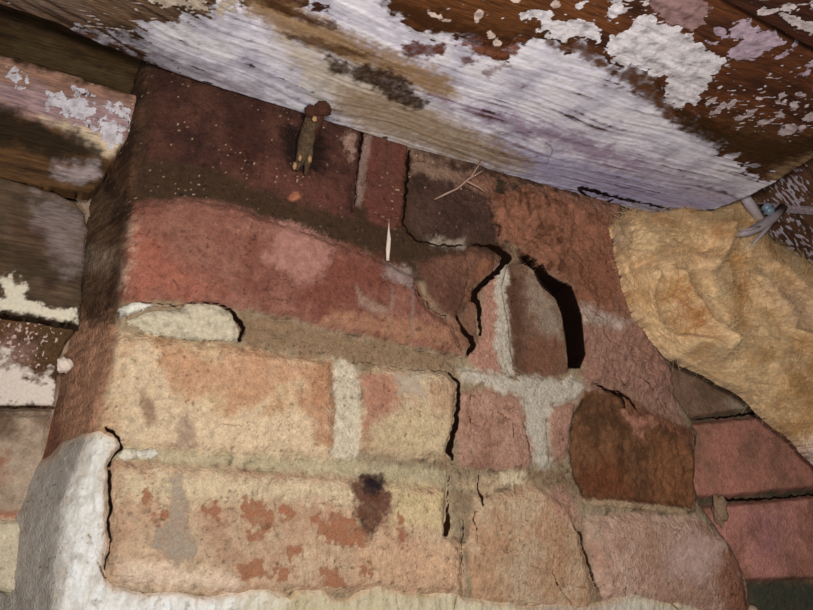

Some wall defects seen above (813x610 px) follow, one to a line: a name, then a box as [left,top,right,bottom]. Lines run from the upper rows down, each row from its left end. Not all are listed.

peeling [148,0,238,17]
peeling [5,65,30,90]
peeling [401,40,446,57]
peeling [462,30,520,64]
peeling [519,0,813,117]
peeling [45,85,133,150]
peeling [735,92,813,136]
rust [281,124,325,171]
crack [401,150,512,356]
crack [363,350,484,572]
crack [98,427,123,578]
leakage [364,477,384,494]